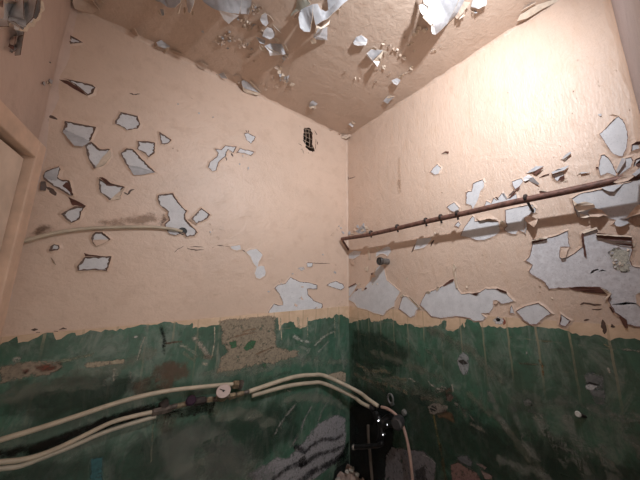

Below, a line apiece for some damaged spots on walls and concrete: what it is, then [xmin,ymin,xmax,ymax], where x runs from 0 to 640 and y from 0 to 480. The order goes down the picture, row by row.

peeling [61,78,98,98]
peeling [203,0,295,88]
peeling [291,0,348,44]
peeling [353,35,413,85]
peeling [419,0,487,35]
peeling [59,119,179,202]
peeling [40,165,88,225]
peeling [155,192,223,239]
peeling [446,151,571,243]
peeling [523,114,640,329]
peeling [74,230,114,274]
peeling [217,243,575,375]